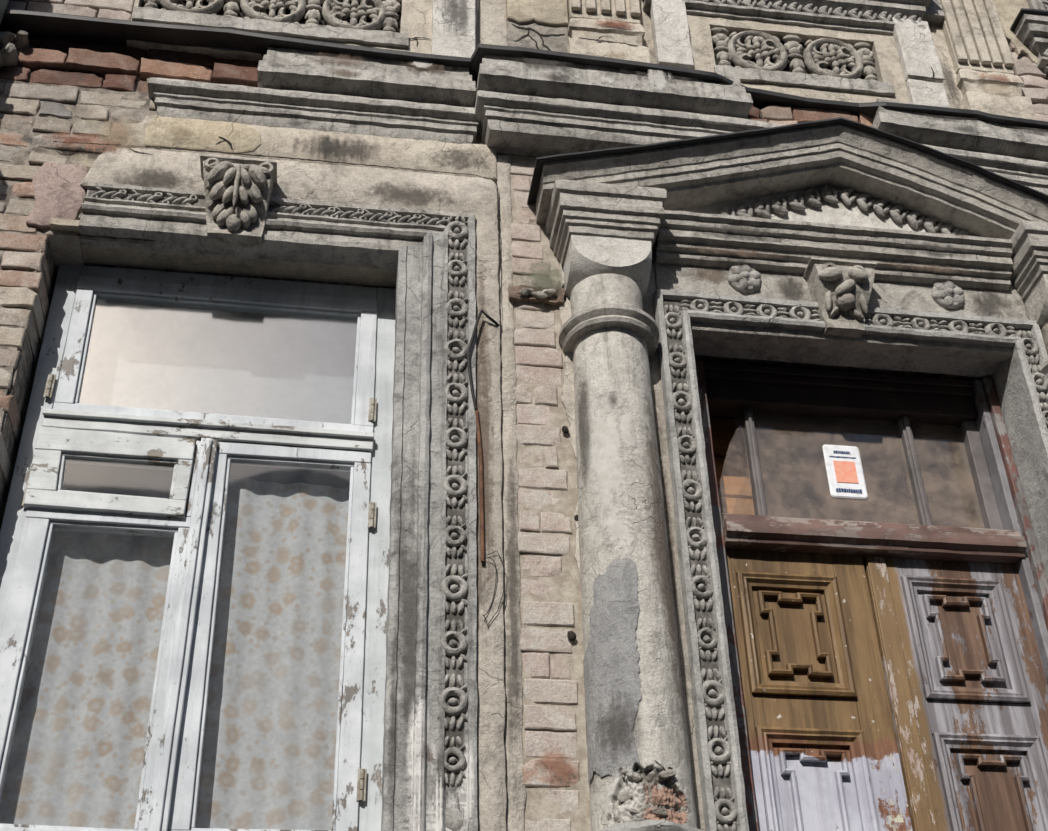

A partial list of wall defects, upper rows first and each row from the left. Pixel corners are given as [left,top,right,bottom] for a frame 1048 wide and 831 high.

crack [512,24,638,51]
leakage [310,137,368,159]
spalling [607,765,688,825]